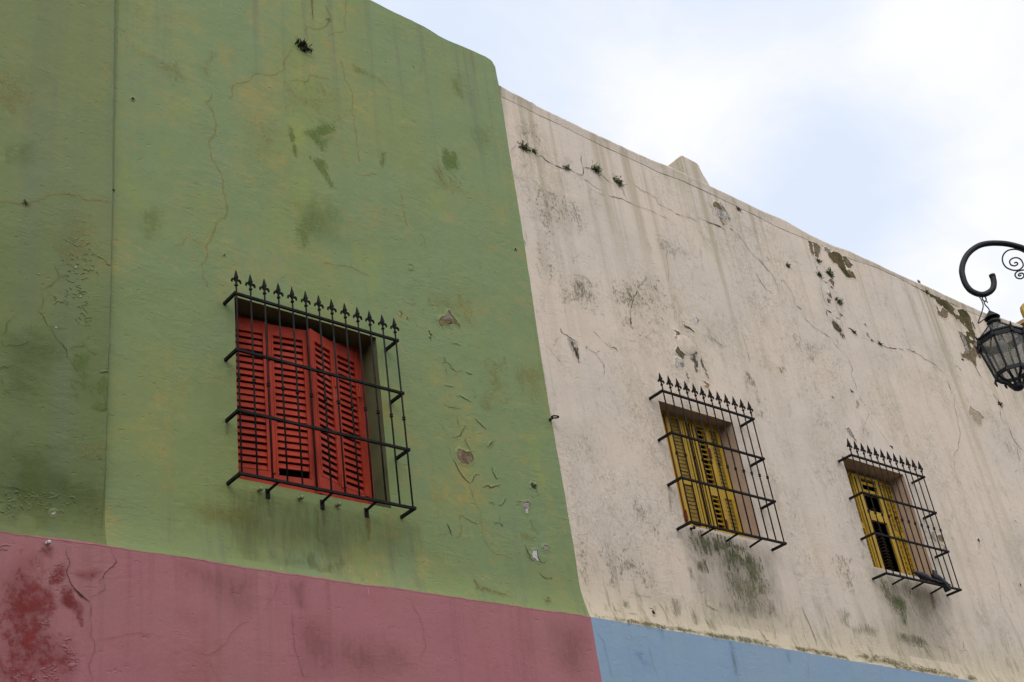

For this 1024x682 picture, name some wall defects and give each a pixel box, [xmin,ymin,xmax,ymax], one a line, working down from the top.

spalling [711,200,731,225]
spalling [672,314,699,370]
crack [514,134,961,485]
spalling [806,239,857,303]
spalling [920,289,981,370]
peeling [0,569,81,682]
crack [41,549,115,681]